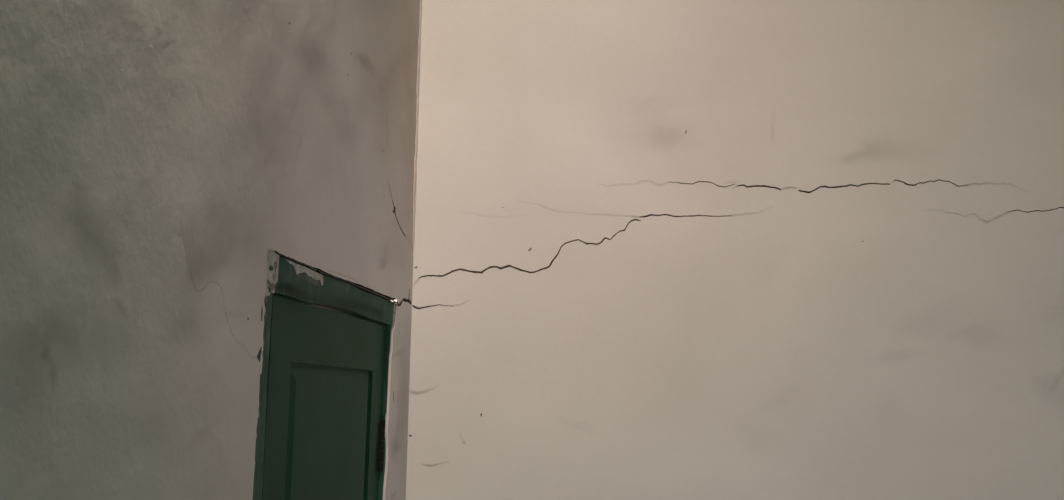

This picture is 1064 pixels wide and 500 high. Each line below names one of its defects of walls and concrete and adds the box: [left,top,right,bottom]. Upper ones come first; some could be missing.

crack [672,179,967,194]
crack [1010,206,1064,214]
crack [274,214,731,310]